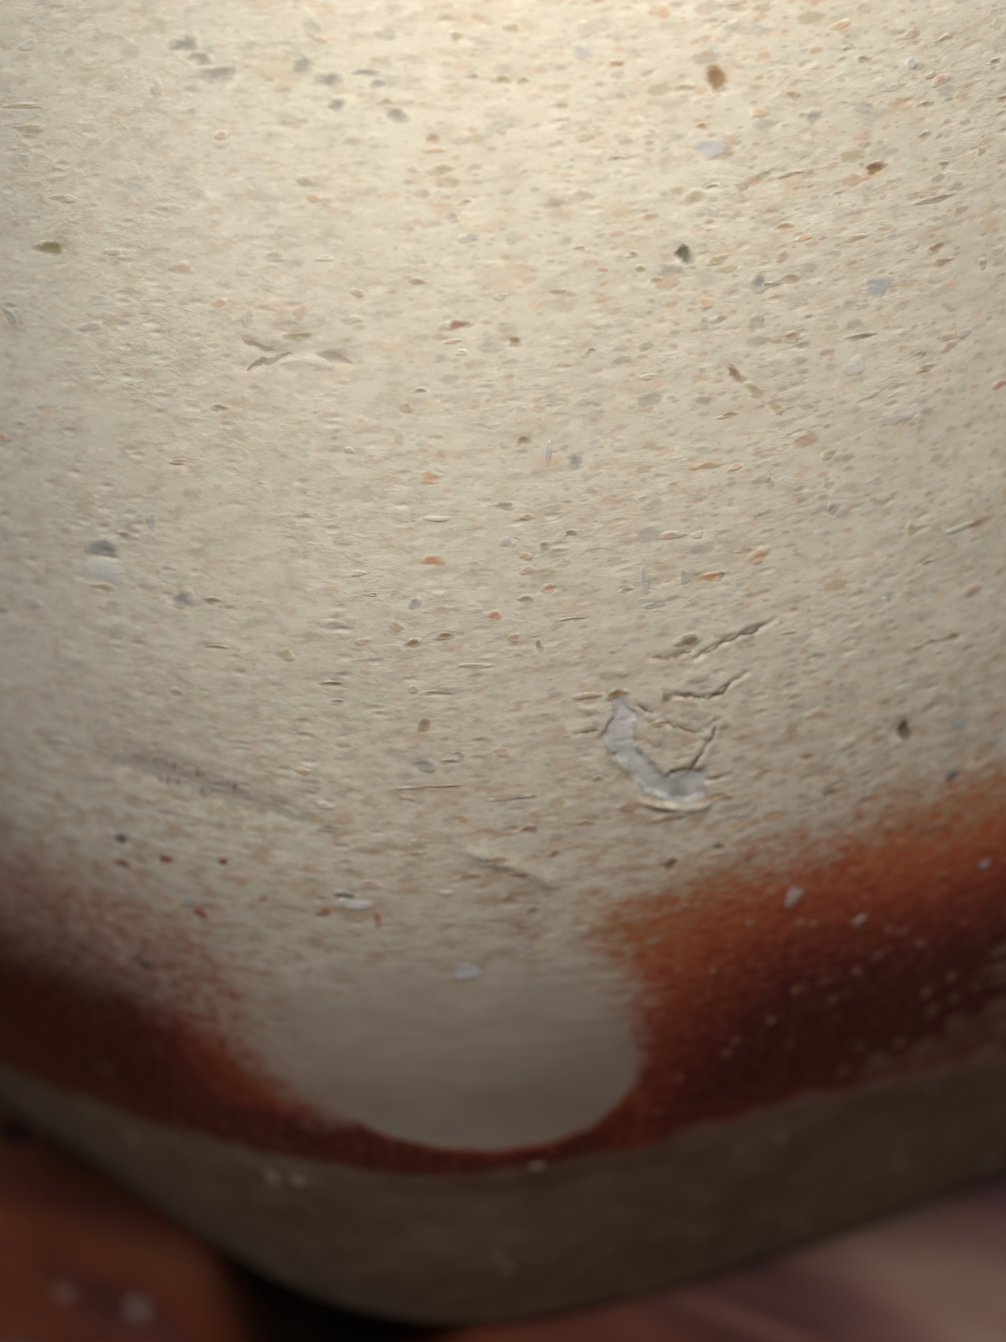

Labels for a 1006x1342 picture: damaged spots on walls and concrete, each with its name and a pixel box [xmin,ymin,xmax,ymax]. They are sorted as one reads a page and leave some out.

corrosion [0,693,1006,1187]
crack [570,622,769,824]